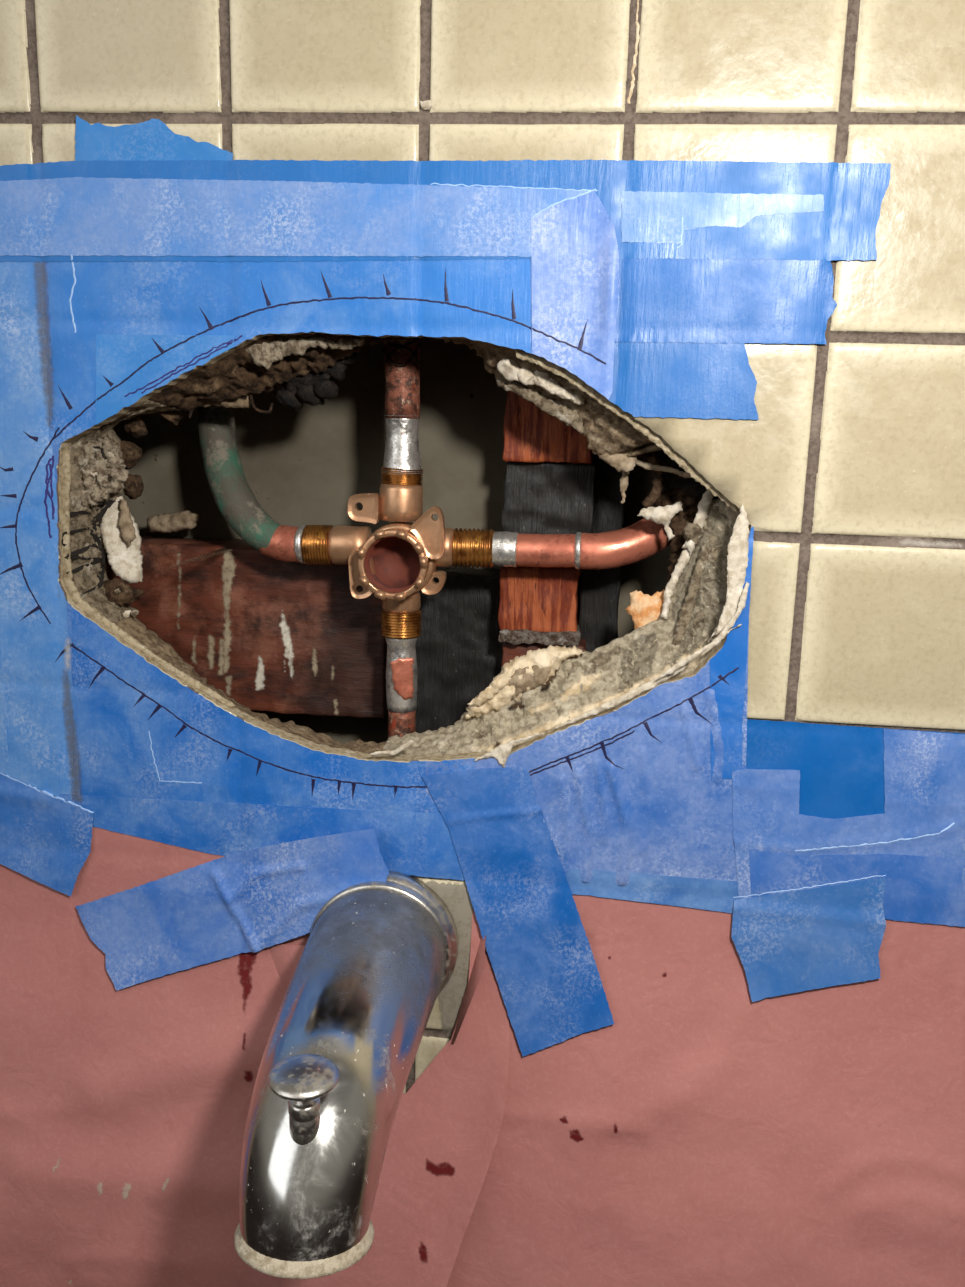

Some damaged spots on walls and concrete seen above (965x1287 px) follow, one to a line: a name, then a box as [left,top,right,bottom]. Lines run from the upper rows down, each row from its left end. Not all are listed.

spalling [61,333,750,768]